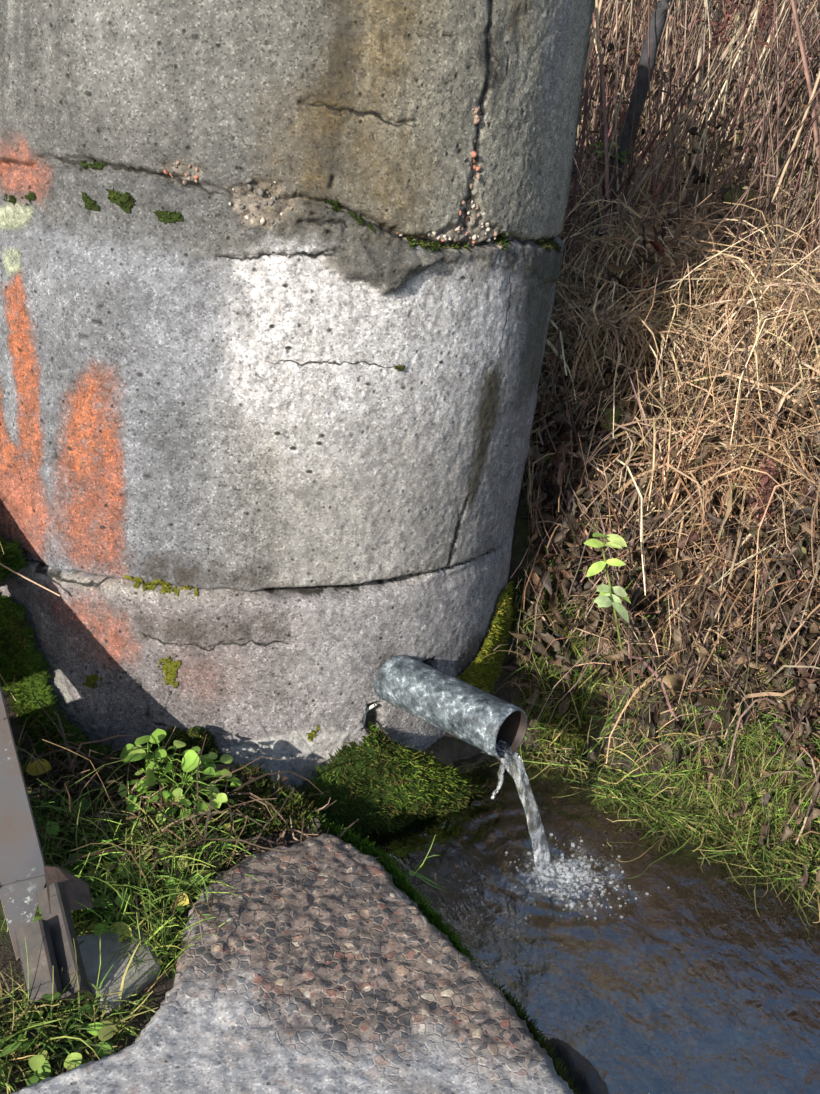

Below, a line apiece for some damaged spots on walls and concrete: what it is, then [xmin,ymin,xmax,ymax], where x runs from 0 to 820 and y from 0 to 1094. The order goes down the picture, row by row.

corrosion [0,150,41,191]
crack [218,0,557,261]
spalling [472,106,488,124]
corrosion [0,276,122,561]
peeling [59,140,515,477]
crack [265,359,393,368]
water stain [465,371,499,507]
crack [496,277,512,364]